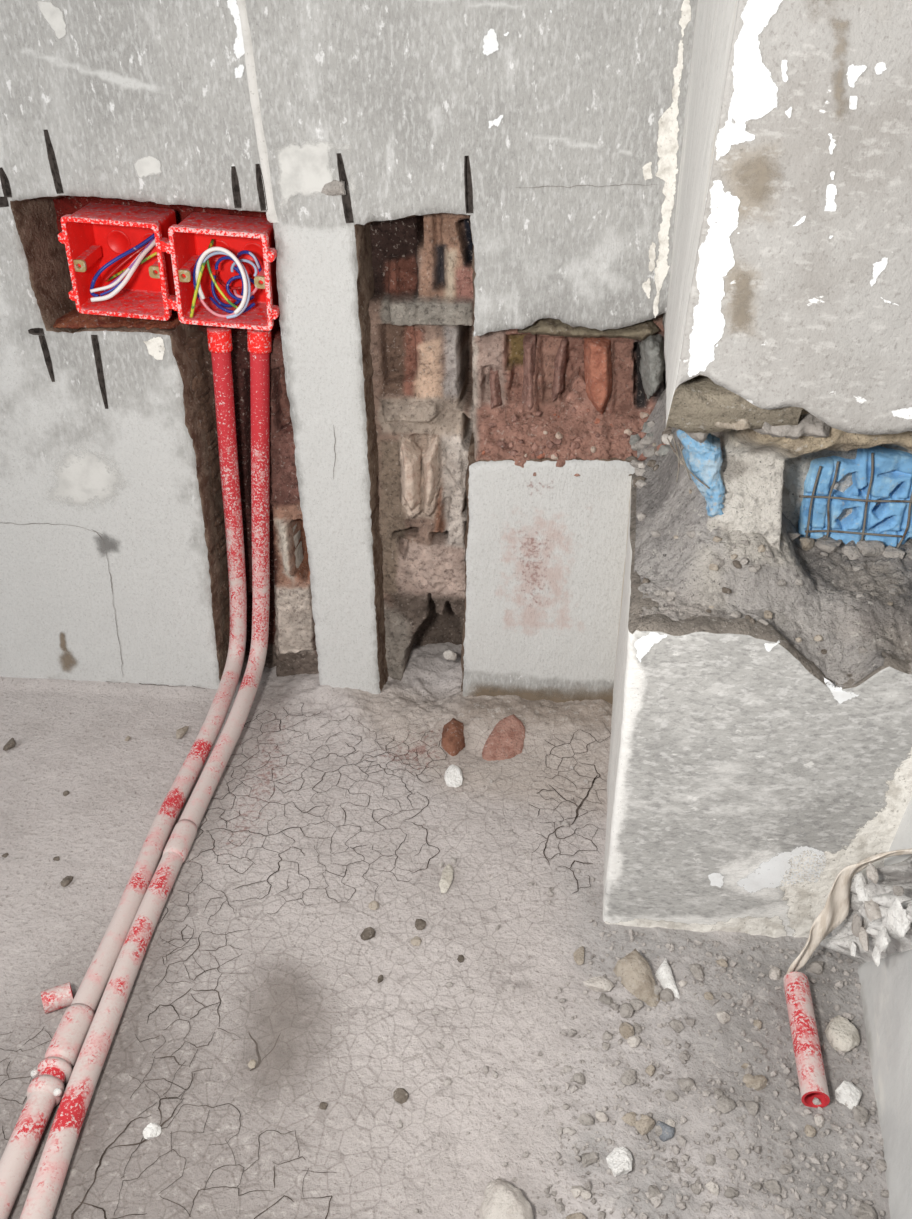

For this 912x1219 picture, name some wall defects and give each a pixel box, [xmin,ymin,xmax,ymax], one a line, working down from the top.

peeling [227,0,245,78]
flaking render [53,196,267,246]
flaking render [198,325,217,434]
spalling [368,0,912,704]
flaking render [231,328,252,655]
flaking render [264,314,319,677]
crack [0,522,205,689]
crack [543,776,597,865]
spalling [605,747,912,967]
crack [249,1033,281,1071]
crack [71,1098,184,1219]